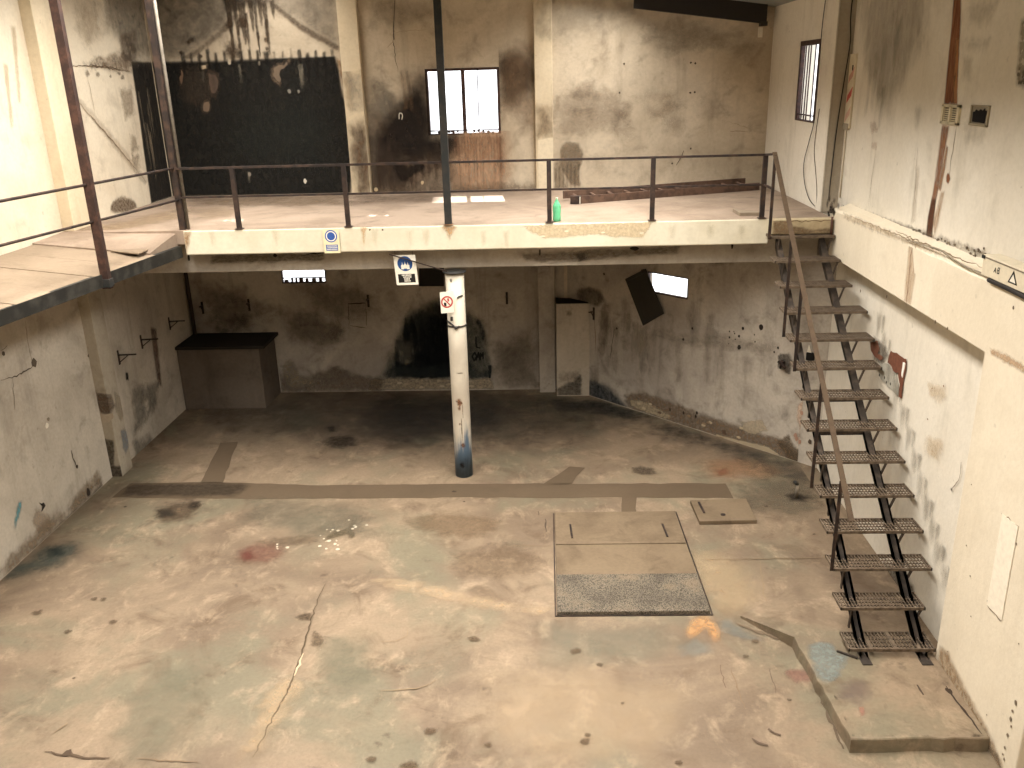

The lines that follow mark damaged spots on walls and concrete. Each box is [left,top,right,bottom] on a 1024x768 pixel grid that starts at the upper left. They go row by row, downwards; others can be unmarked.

leakage [225,0,274,49]
corrosion [944,0,961,104]
leakage [556,142,582,186]
corrosion [926,126,957,237]
peeling [527,222,651,251]
crack [1,321,37,405]
spalling [870,341,906,398]
crack [254,585,325,755]
crack [752,728,781,746]
crack [821,701,844,749]